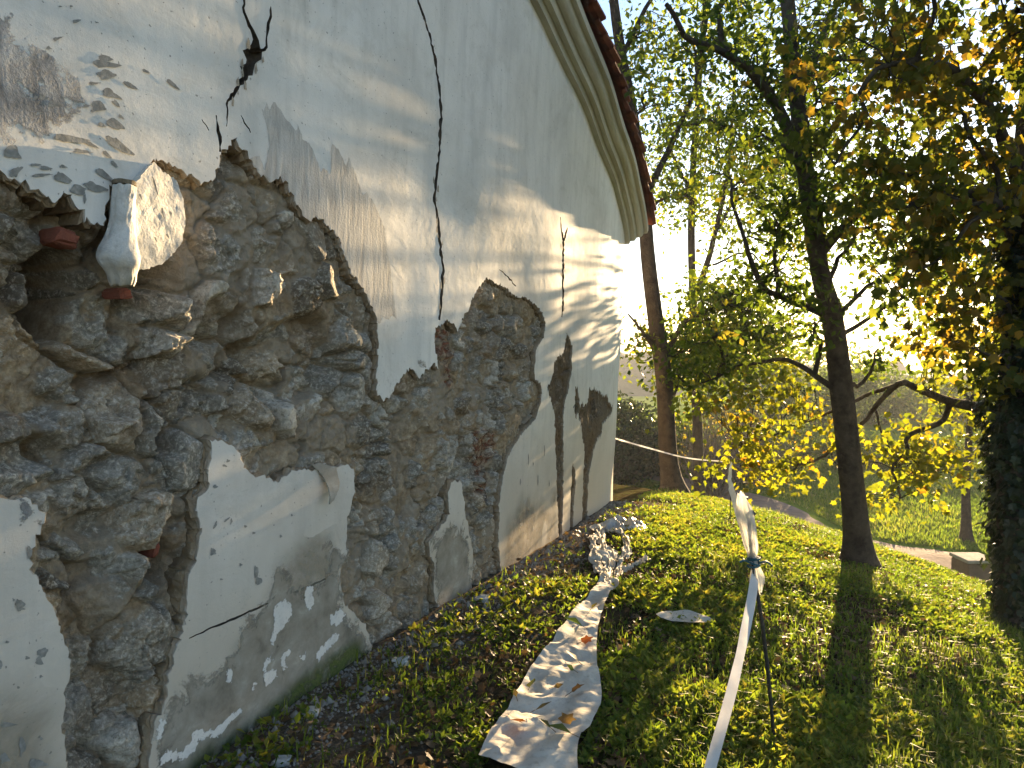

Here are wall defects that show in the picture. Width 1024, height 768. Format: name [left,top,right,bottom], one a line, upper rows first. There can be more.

crack [202,0,272,152]
crack [417,0,445,320]
spalling [0,13,613,768]
crack [190,603,268,638]